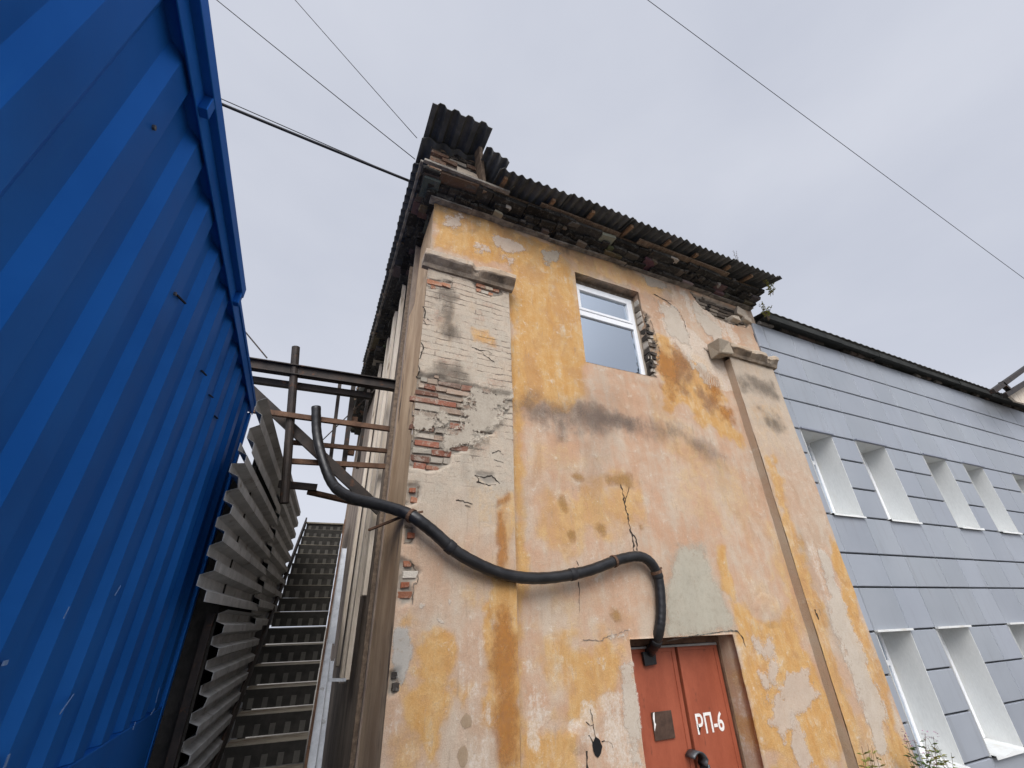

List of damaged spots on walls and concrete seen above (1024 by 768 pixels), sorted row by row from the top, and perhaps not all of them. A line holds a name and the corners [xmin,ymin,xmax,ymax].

peeling [443,213,464,229]
peeling [475,235,525,265]
spalling [426,278,453,290]
spalling [475,283,503,297]
spalling [689,291,752,340]
peeling [634,300,719,388]
spalling [409,375,514,470]
crack [609,476,638,551]
spalling [398,561,425,609]
peeling [751,636,820,768]